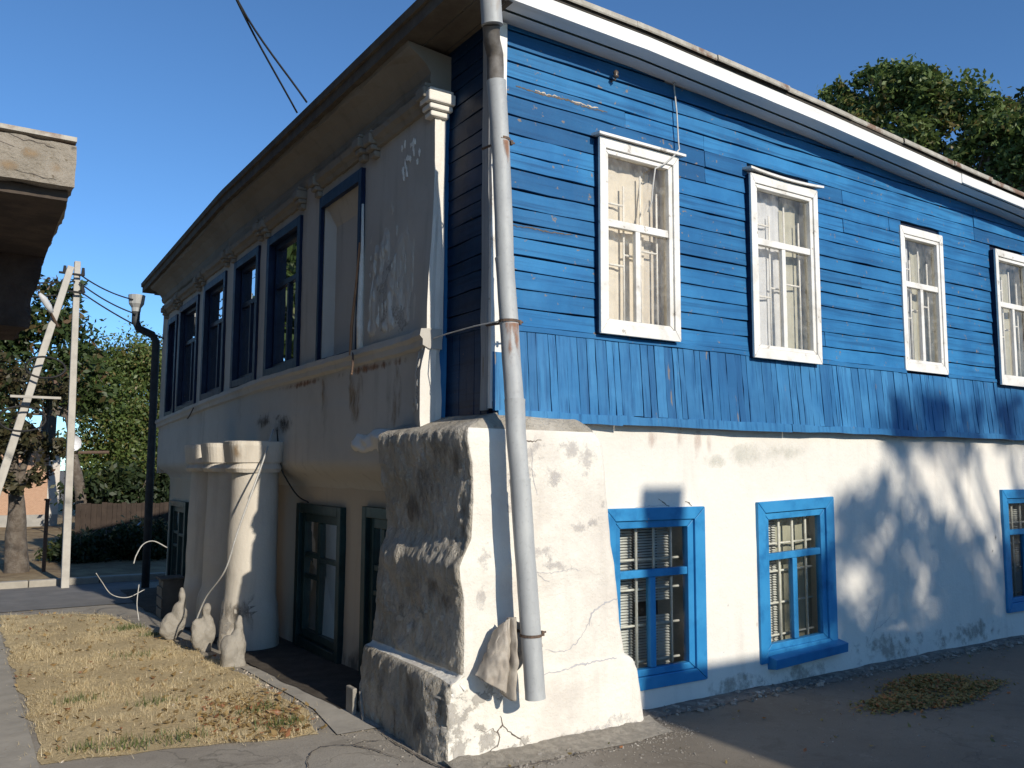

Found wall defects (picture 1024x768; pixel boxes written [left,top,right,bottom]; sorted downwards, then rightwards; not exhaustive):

peeling [401,138,420,181]
peeling [367,202,416,338]
crack [544,599,617,675]
crack [306,723,445,768]
crack [481,716,589,768]